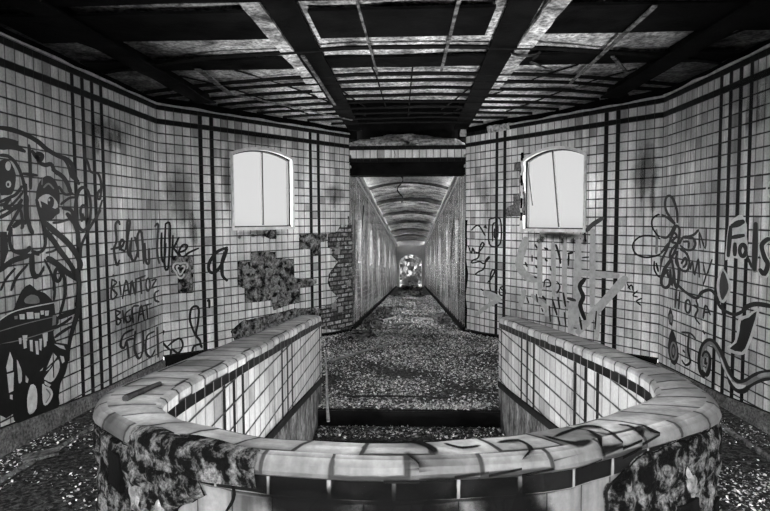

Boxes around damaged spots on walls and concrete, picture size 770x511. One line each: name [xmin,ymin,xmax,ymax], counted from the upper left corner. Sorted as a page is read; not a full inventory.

peeling [231,216,353,340]
spalling [93,424,261,511]
spalling [603,422,722,511]